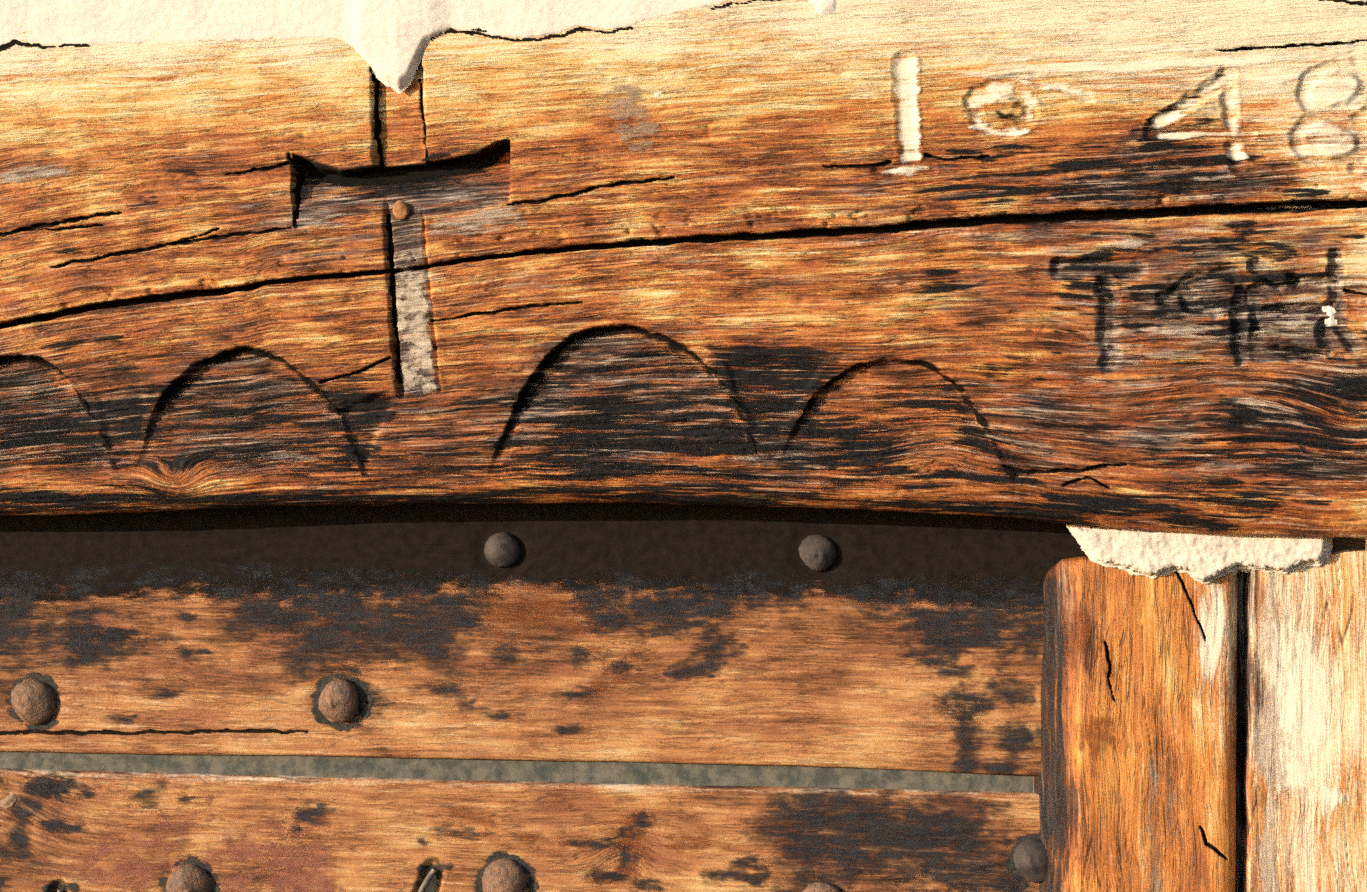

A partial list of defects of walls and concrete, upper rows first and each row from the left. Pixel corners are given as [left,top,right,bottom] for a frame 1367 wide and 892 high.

crack [0,200,1367,384]
crack [1174,571,1206,641]
corrosion [5,672,60,731]
crack [0,728,308,736]
corrosion [310,673,373,732]
corrosion [158,856,220,892]